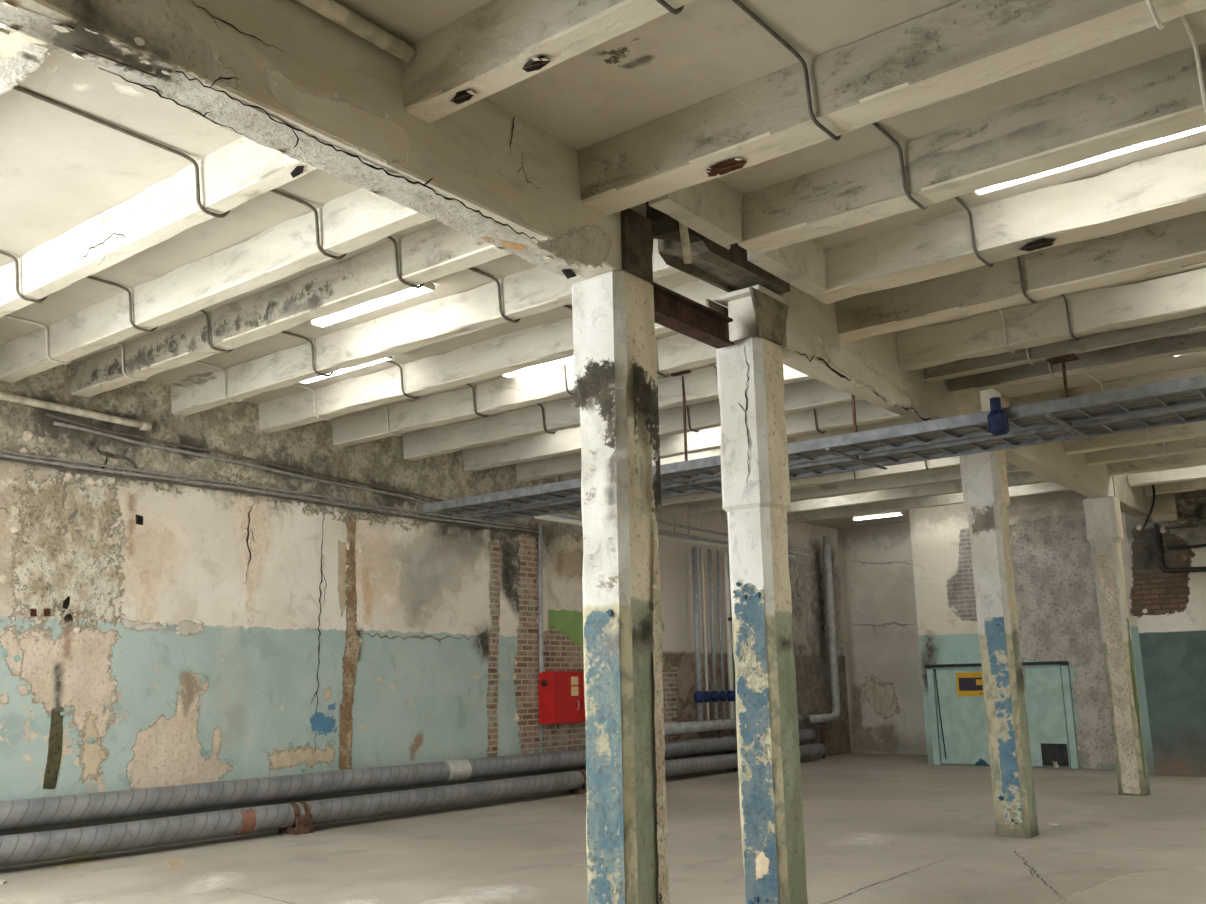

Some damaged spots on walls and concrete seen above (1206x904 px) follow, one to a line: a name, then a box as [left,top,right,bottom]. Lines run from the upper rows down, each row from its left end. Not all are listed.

water stain [68,0,176,71]
spalling [0,0,612,276]
crack [99,68,540,241]
water stain [8,270,346,466]
water stain [573,359,617,520]
water stain [632,357,662,513]
flaking render [0,431,425,790]
spalling [652,516,678,904]
peeling [733,582,779,904]
spalling [946,506,1195,828]